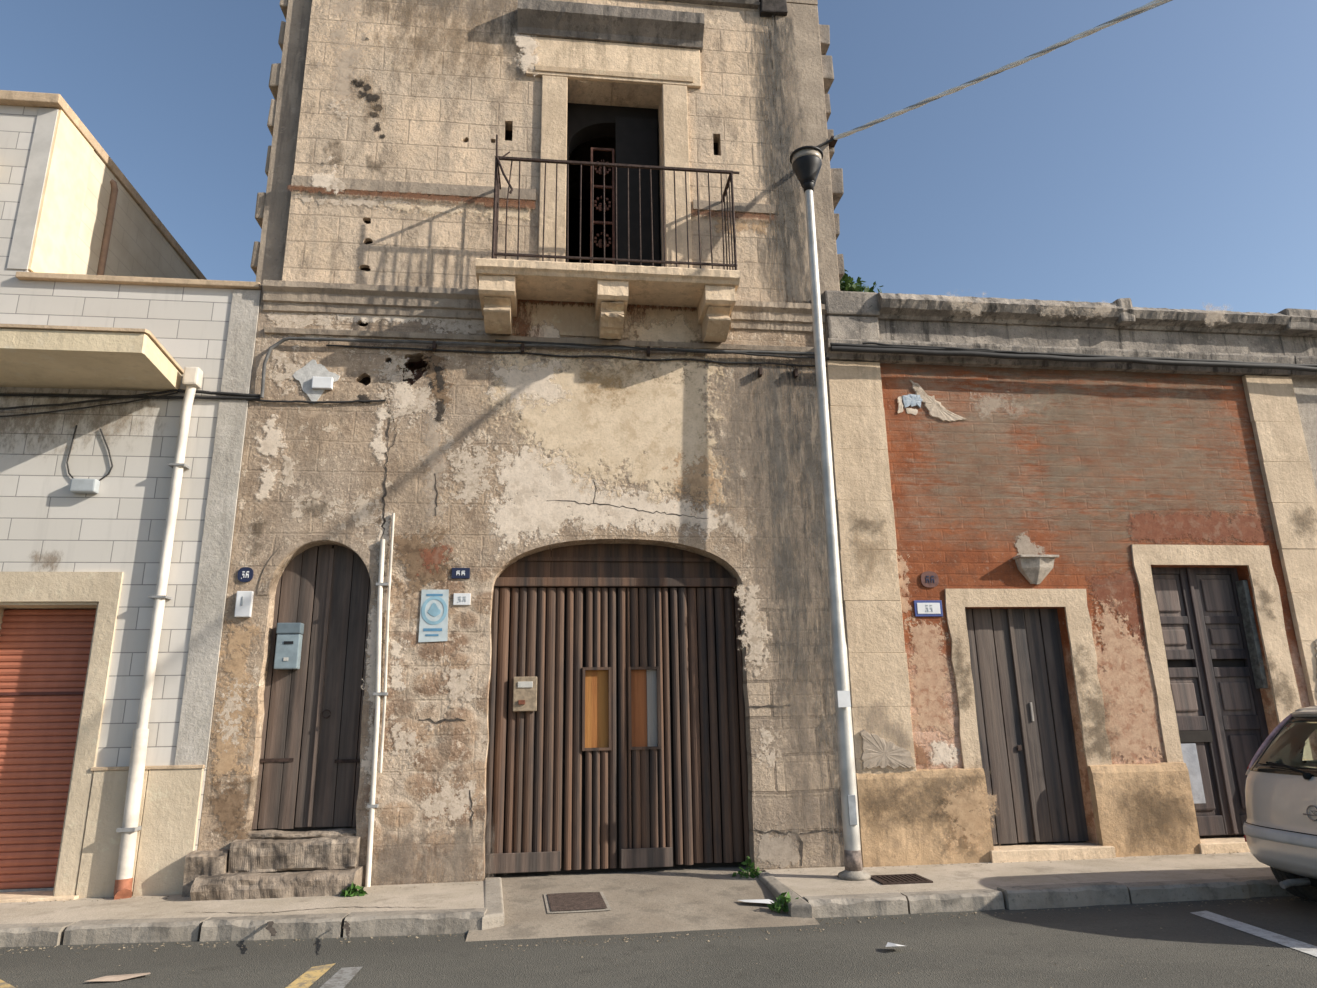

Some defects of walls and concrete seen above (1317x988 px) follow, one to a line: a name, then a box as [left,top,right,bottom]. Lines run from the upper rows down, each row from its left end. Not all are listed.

leakage [751,15,812,304]
crack [369,401,397,539]
crack [548,480,708,519]
flaking render [897,380,967,422]
crack [418,717,466,725]
flaking render [254,312,756,835]
spalling [734,582,772,677]
leakage [718,360,842,860]
peeling [896,552,960,769]
peeling [1086,568,1166,764]
crack [467,790,475,827]
spalling [756,827,801,869]